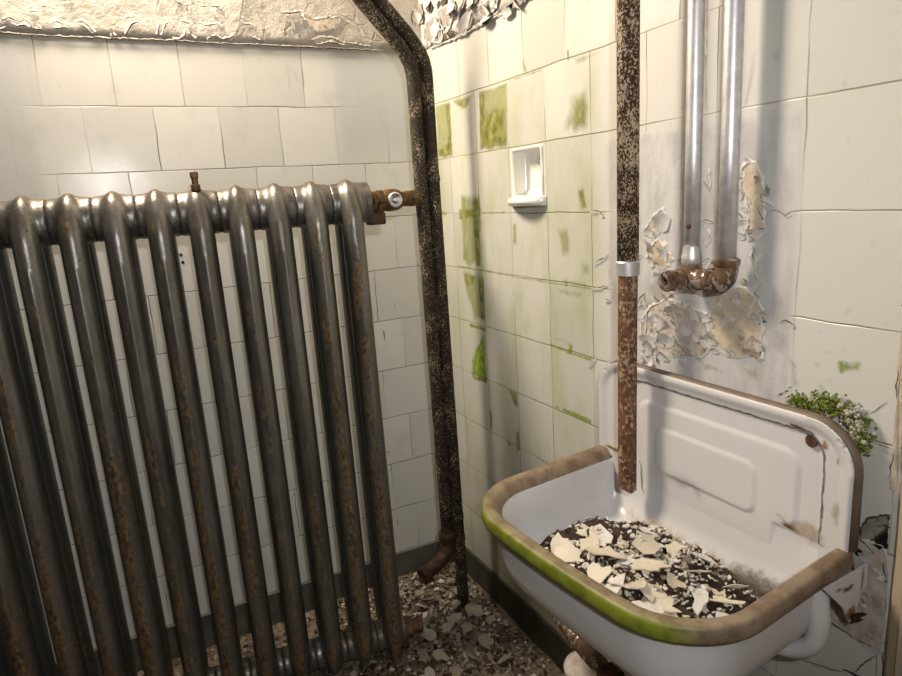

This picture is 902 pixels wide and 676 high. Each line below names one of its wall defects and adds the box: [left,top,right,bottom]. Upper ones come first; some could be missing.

crack [0,0,384,52]
peeling [412,0,523,46]
peeling [738,158,775,242]
peeling [641,206,682,281]
peeling [638,278,766,367]
crack [864,373,899,416]
crack [873,442,902,478]
flaking render [830,514,893,655]